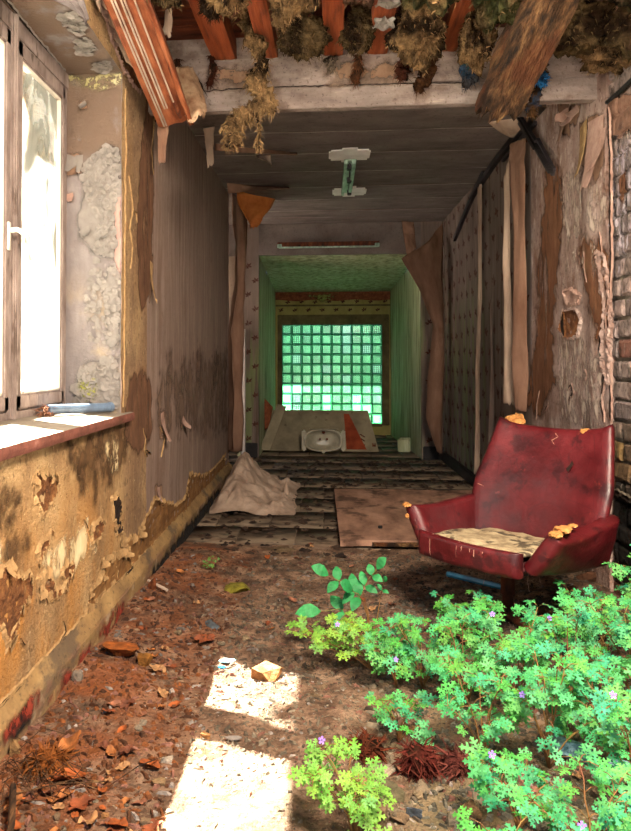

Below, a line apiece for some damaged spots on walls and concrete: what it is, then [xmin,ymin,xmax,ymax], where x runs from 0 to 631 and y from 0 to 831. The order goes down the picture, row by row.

flaking render [55,0,143,95]
flaking render [555,104,606,192]
flaking render [558,286,583,341]
damp [66,351,228,503]
damp [0,486,30,562]
flaking render [0,528,75,655]
flaking render [31,465,59,519]
damp [43,519,97,577]